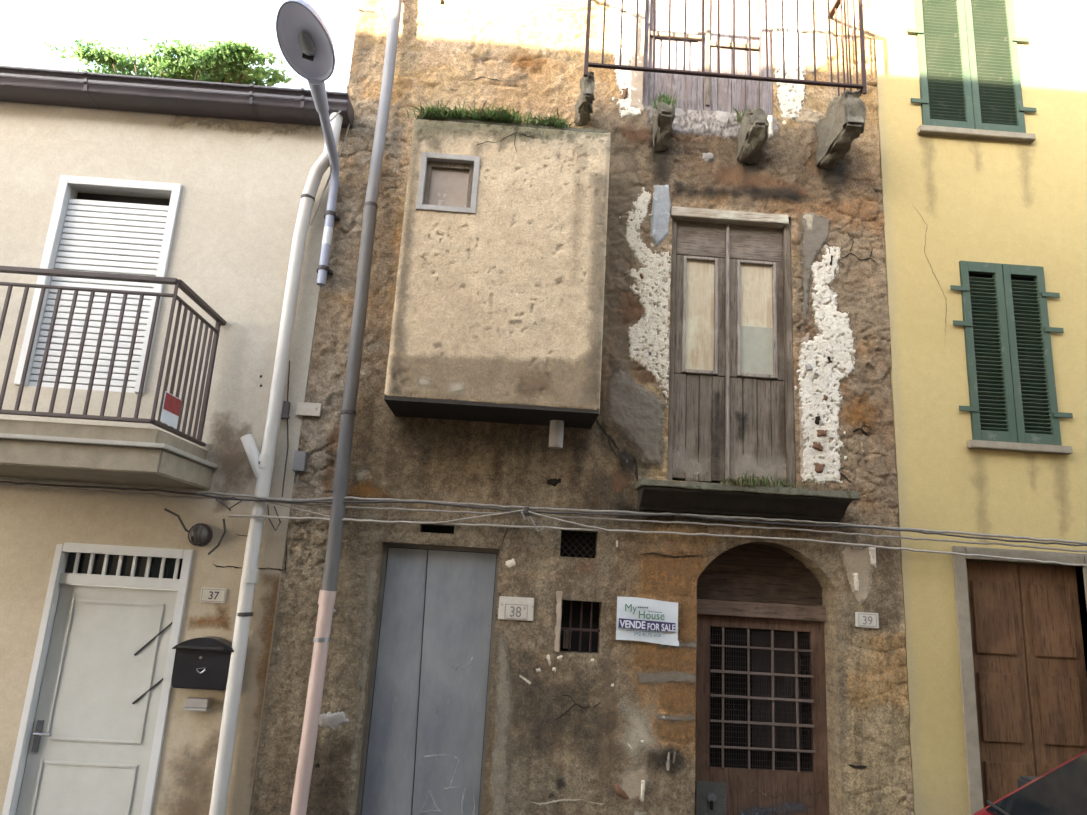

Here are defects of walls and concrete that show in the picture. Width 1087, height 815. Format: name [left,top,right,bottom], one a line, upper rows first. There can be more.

peeling [608,0,657,143]
spalling [672,108,745,138]
peeling [767,0,835,140]
peeling [619,187,671,408]
peeling [794,245,857,484]